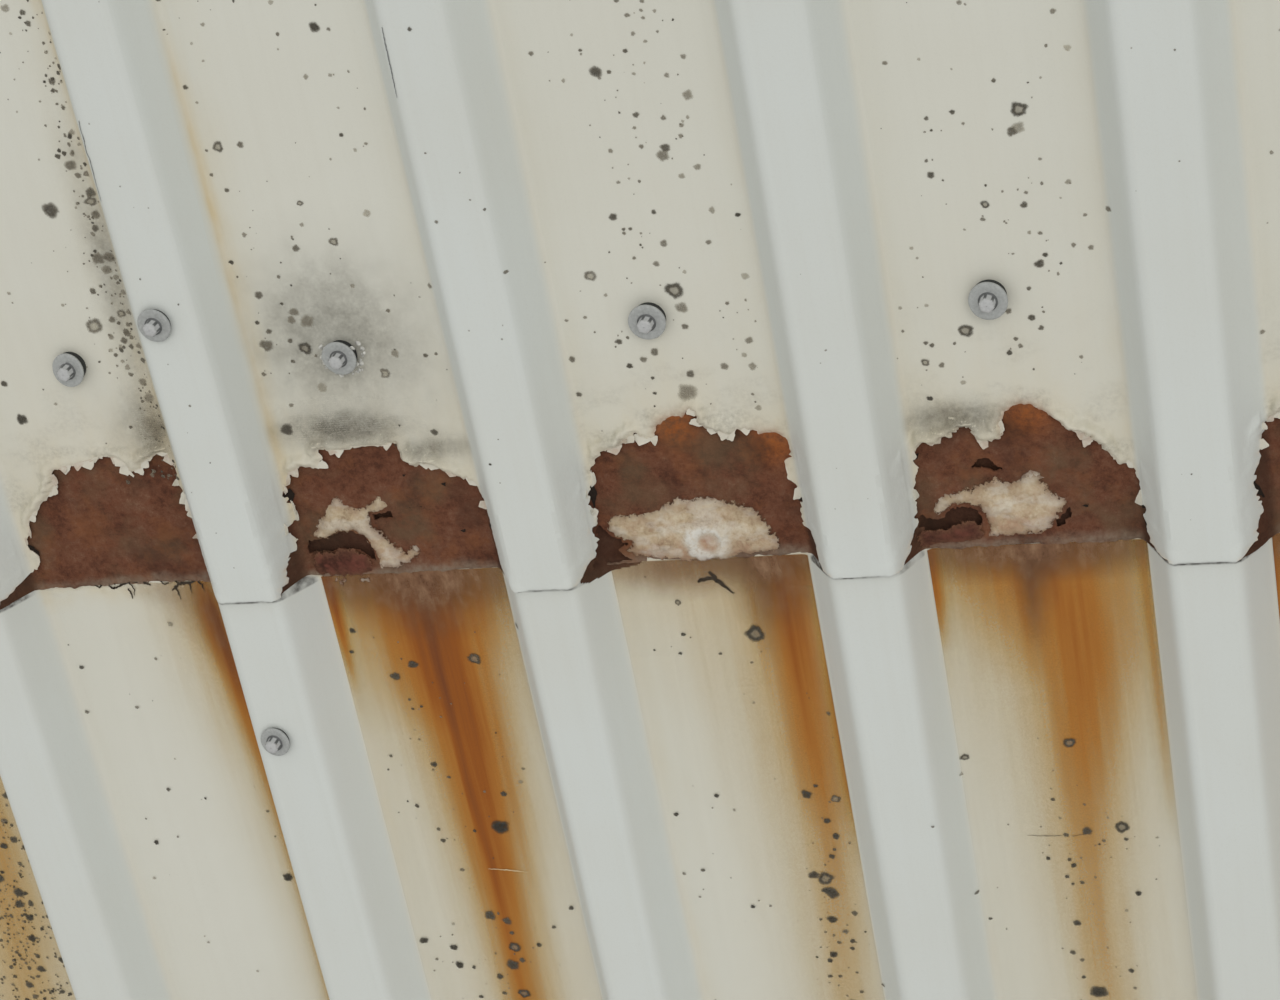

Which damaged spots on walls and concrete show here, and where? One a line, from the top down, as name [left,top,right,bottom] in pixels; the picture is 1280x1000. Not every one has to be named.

corrosion [0,418,546,1000]
corrosion [549,383,854,938]
corrosion [871,380,1194,995]
corrosion [1214,381,1280,617]